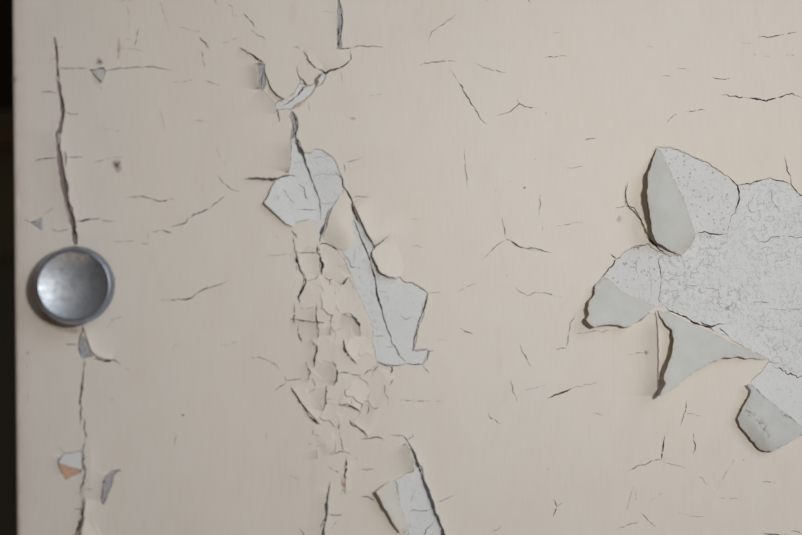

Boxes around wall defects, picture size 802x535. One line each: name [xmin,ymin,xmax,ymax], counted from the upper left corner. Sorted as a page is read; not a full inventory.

crack [57,47,65,147]
peeling [241,48,351,122]
crack [421,61,485,123]
crack [715,78,796,102]
crack [65,176,78,244]
peeling [246,138,438,373]
crack [484,195,581,258]
peeling [586,147,802,451]
crack [252,230,385,492]
peeling [75,493,102,535]
peeling [321,484,340,535]
peeling [364,435,449,535]